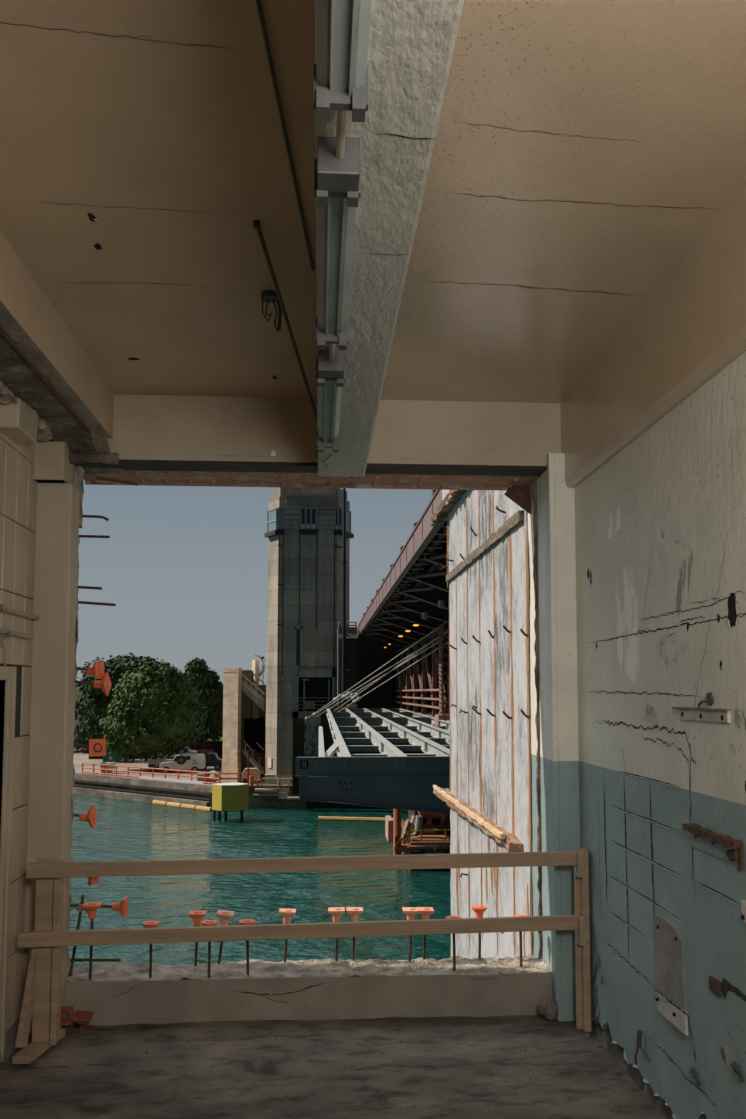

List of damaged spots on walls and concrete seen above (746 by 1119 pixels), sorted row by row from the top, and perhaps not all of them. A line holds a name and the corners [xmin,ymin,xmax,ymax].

crack [375,121,651,143]
corrosion [447,490,498,854]
corrosion [509,530,531,852]
crack [586,541,746,816]
corrosion [456,867,499,918]
corrosion [513,867,532,916]
corrosion [514,931,532,956]
spalling [582,954,676,1119]